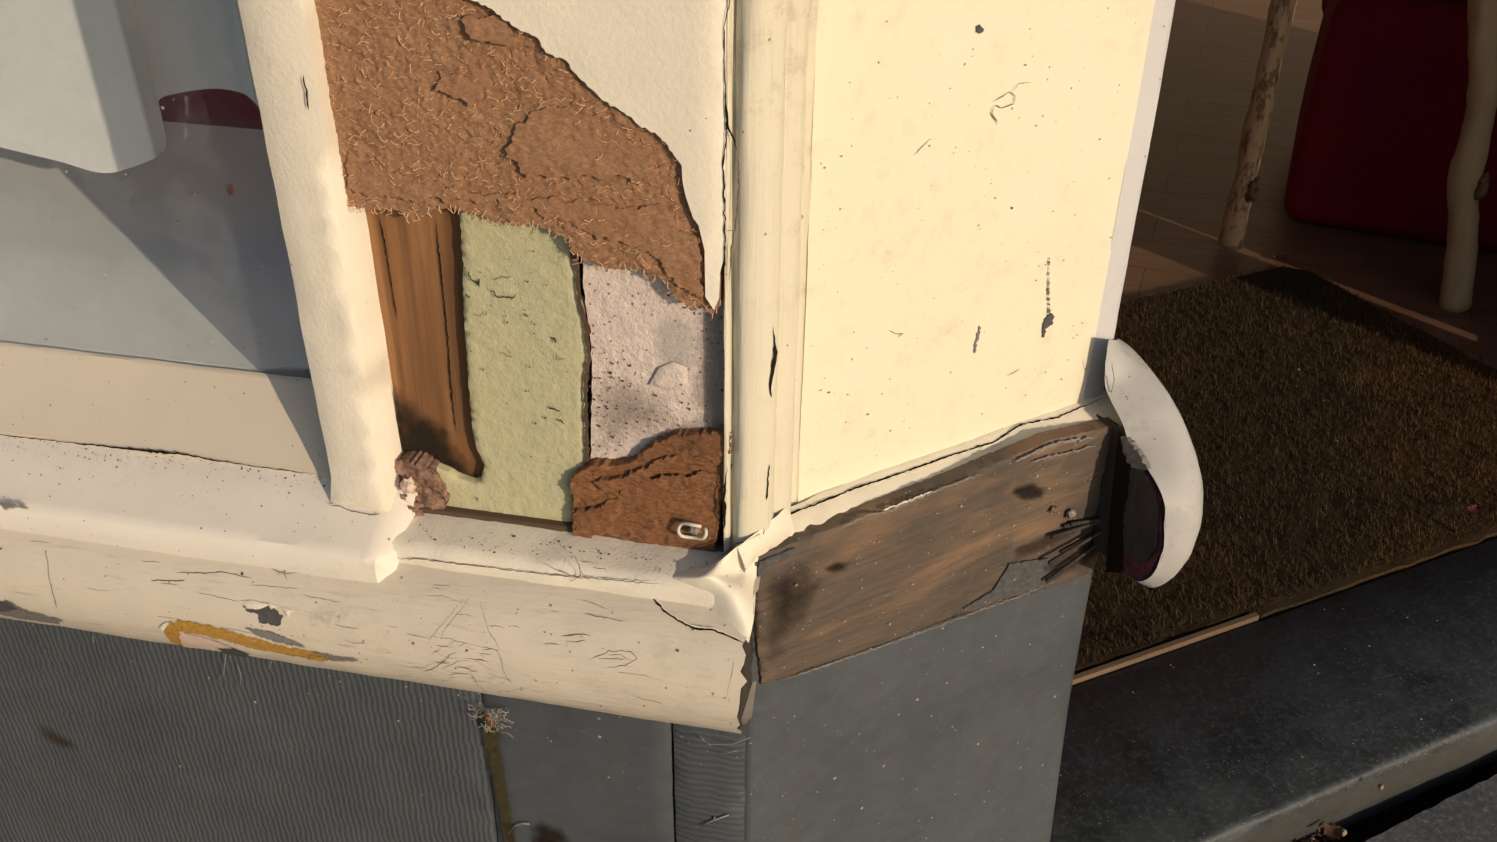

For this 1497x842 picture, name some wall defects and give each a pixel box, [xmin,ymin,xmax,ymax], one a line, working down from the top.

peeling [462,14,521,46]
peeling [346,105,705,299]
spalling [466,271,516,316]
peeling [649,361,689,391]
crack [769,328,778,397]
peeling [572,445,724,539]
crack [717,368,1165,581]
peeling [0,600,61,625]
peeling [159,600,356,662]
crack [144,556,746,726]